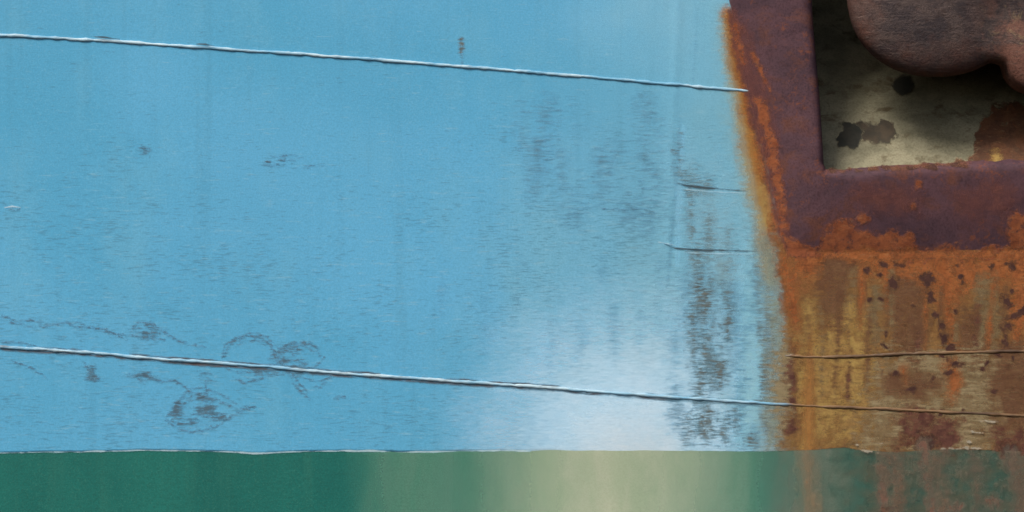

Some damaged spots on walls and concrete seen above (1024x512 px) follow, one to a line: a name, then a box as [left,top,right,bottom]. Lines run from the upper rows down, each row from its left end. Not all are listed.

leakage [2,142,1019,512]
peeling [836,119,898,149]
corrosion [722,8,1024,512]
peeling [892,74,915,96]